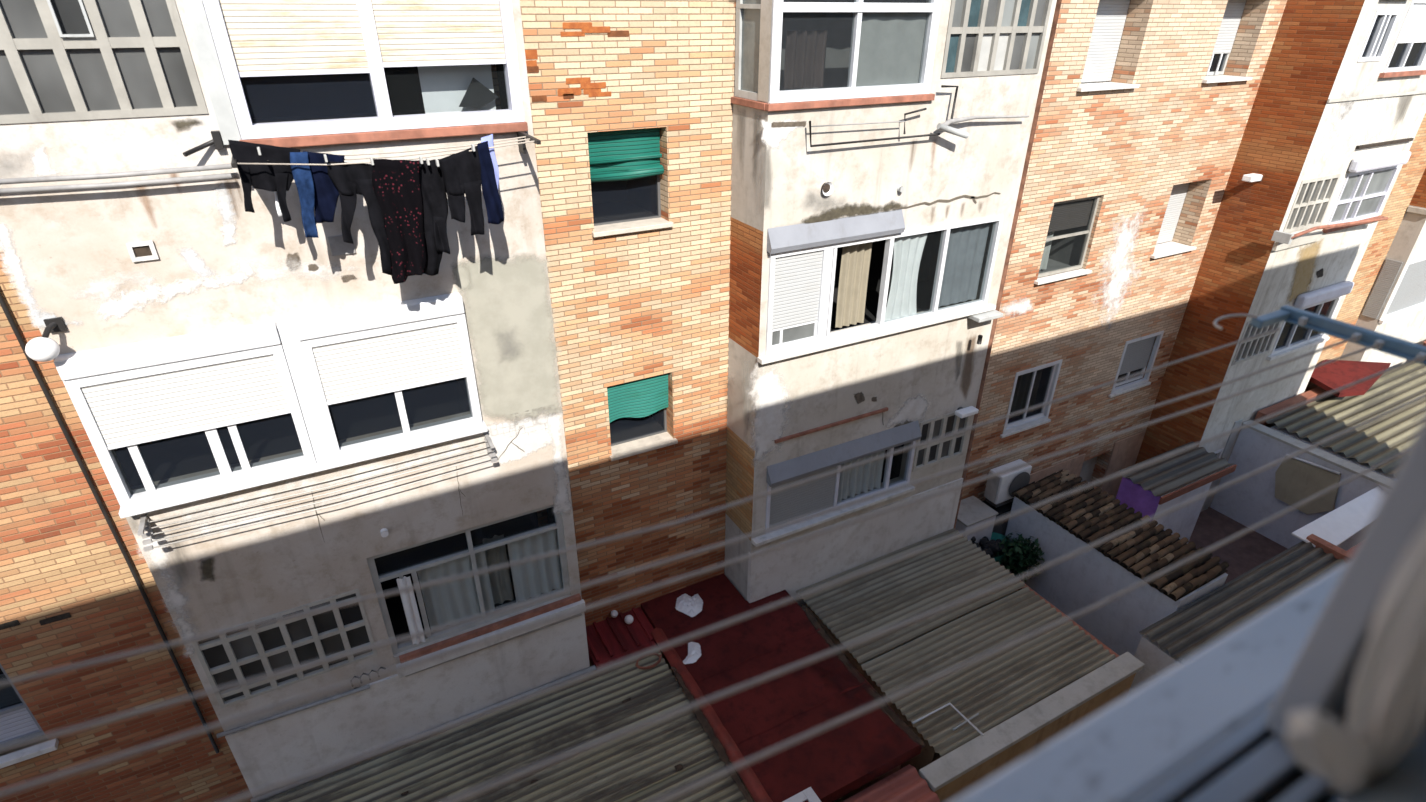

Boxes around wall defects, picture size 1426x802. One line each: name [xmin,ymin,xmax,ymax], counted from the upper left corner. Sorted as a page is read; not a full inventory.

peeling [32,146,60,177]
peeling [216,183,236,245]
crack [893,192,1000,209]
peeling [0,224,78,327]
peeling [83,249,355,319]